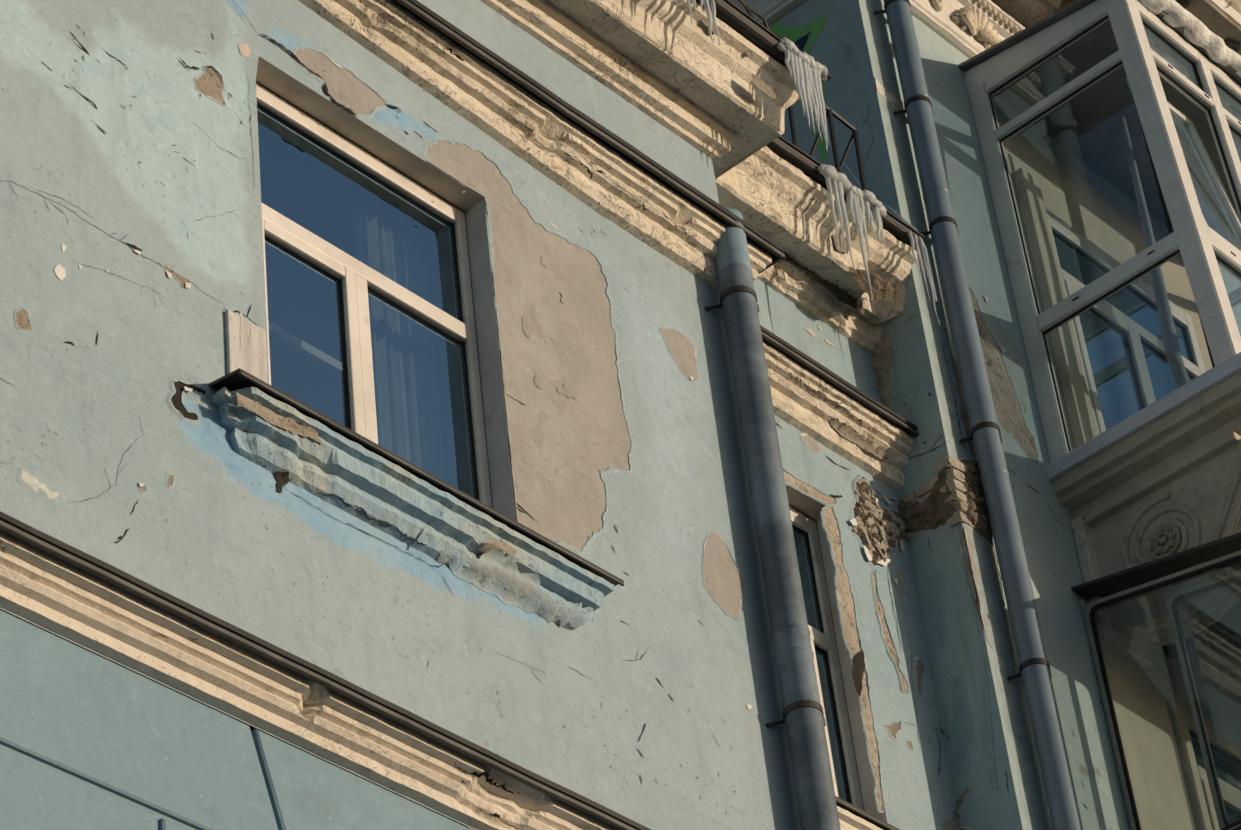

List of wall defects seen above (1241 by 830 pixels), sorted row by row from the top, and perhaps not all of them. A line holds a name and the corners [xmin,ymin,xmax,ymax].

spalling [179,50,233,107]
crack [6,180,169,310]
spalling [236,392,323,444]
spalling [261,34,634,557]
spalling [646,322,713,382]
spalling [968,283,1038,464]
spalling [701,530,744,622]
spalling [783,355,1016,813]